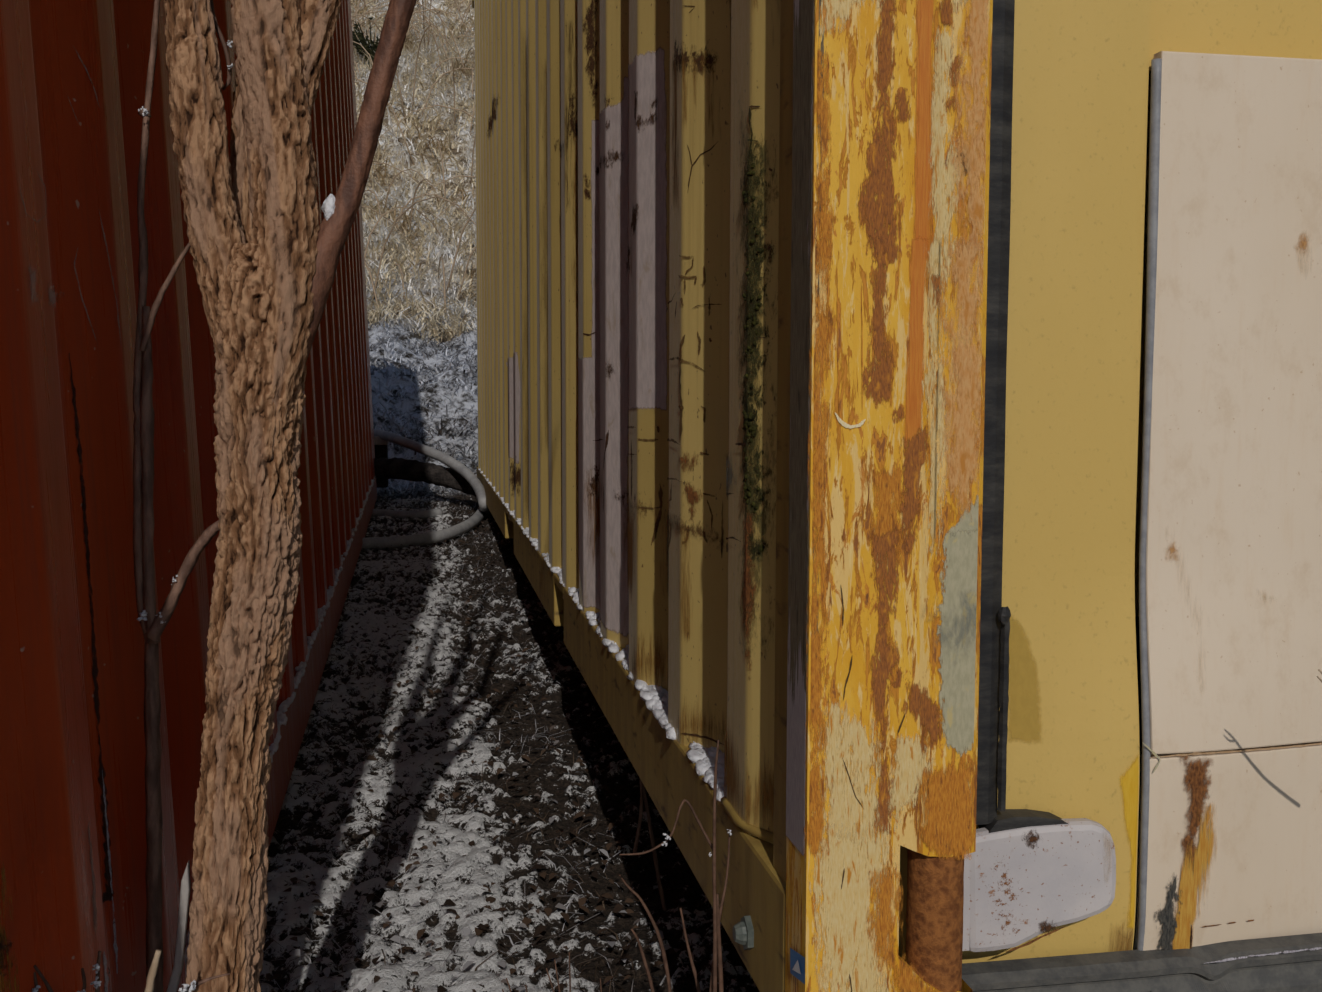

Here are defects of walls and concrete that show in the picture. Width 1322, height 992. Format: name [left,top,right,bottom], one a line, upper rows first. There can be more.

corrosion [672,42,717,188]
corrosion [939,0,958,29]
corrosion [946,55,963,112]
peeling [788,0,884,702]
corrosion [856,0,943,834]
peeling [905,0,989,757]
peeling [809,700,933,992]
corrosion [868,868,937,992]
corrosion [918,756,974,860]
corrosion [1172,756,1216,949]